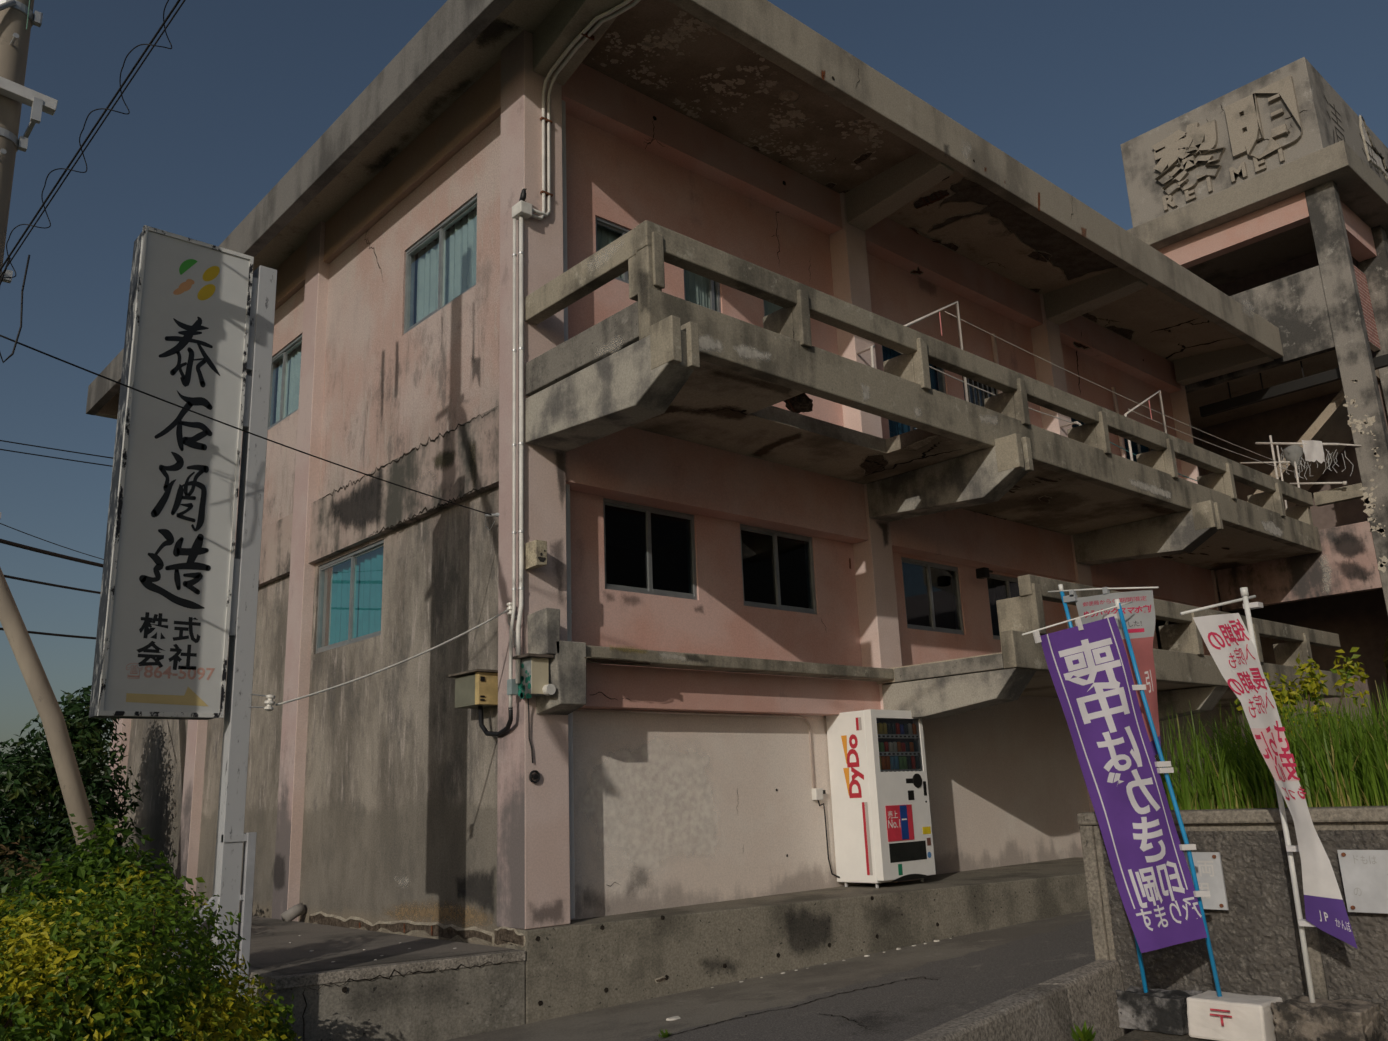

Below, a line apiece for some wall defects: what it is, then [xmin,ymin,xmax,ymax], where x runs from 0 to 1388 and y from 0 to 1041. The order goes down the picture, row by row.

peeling [592,11,885,173]
peeling [1359,115,1388,181]
peeling [909,177,1118,281]
leakage [331,469,382,528]
peeling [1343,379,1386,537]
spalling [309,911,526,947]